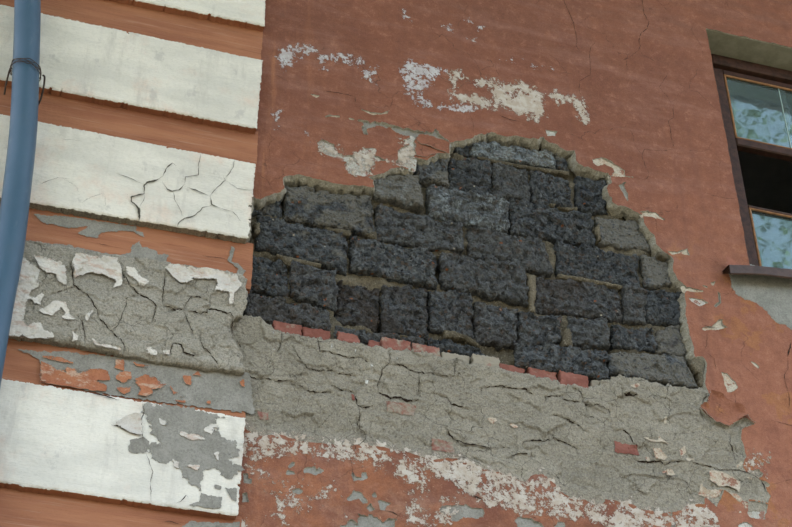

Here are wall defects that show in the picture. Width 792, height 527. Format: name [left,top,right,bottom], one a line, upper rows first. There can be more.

crack [119,155,246,226]
crack [57,267,244,368]
spalling [9,111,771,527]
crack [250,340,609,480]
crack [623,430,766,494]